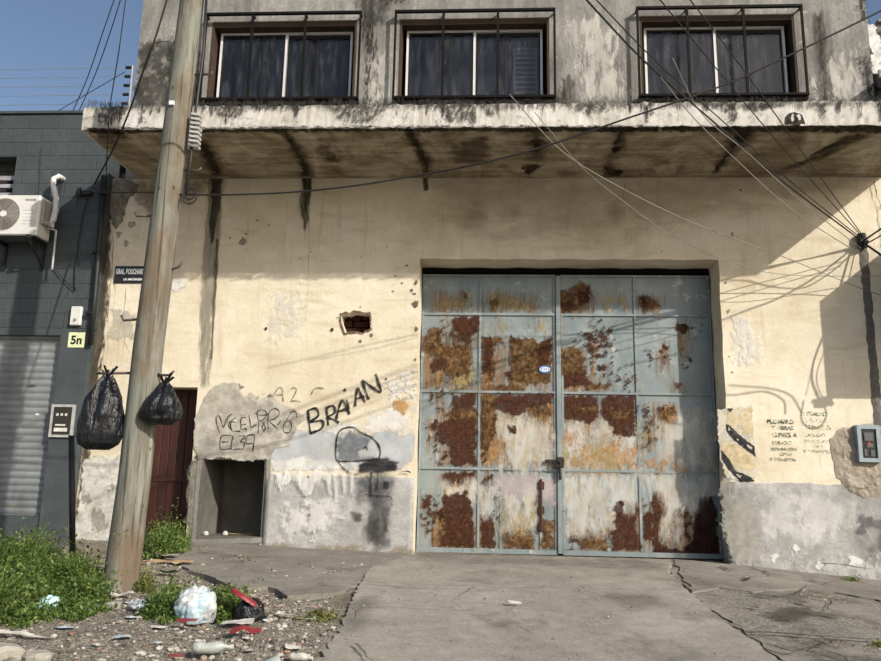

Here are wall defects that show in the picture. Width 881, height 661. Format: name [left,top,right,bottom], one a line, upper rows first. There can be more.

damp [83,40,174,141]
damp [193,0,881,385]
spalling [330,306,373,342]
peeling [194,382,364,471]
rust [419,281,720,560]
peeling [719,478,764,566]
crack [720,555,881,661]